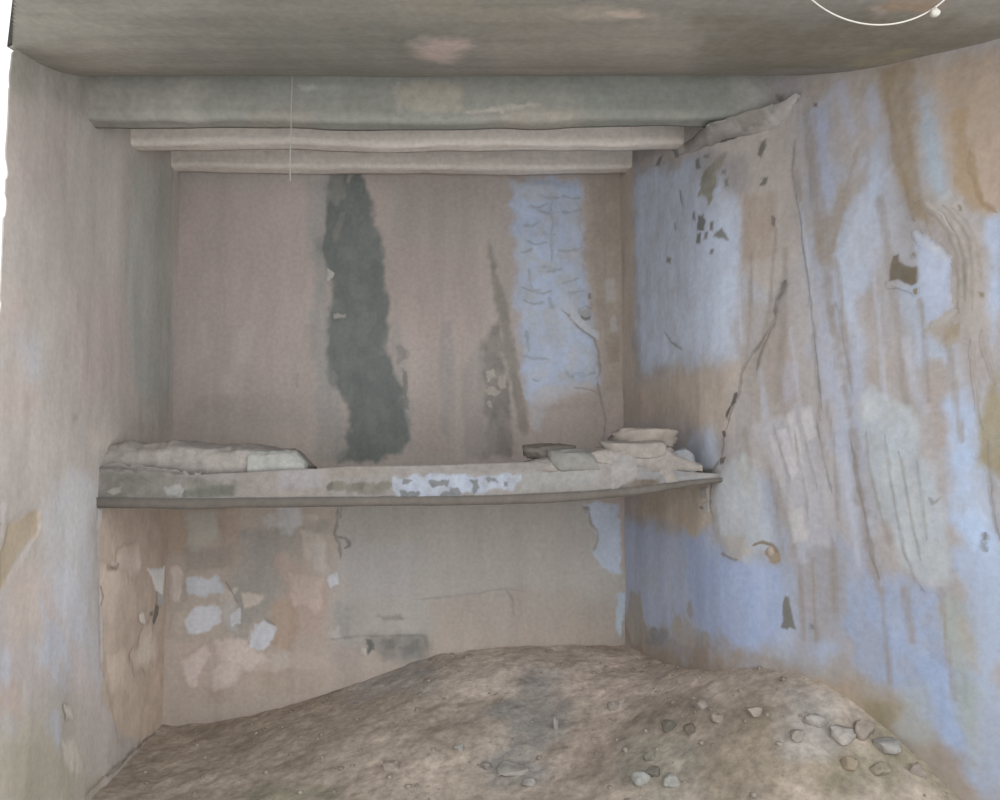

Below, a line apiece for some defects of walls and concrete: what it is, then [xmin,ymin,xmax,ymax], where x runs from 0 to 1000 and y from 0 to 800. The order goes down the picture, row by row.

peeling [679,149,731,256]
water stain [301,174,413,466]
peeling [505,174,602,437]
crack [699,140,822,521]
peeling [886,229,954,322]
flaking render [94,508,293,744]
peeling [260,507,340,616]
crack [332,507,352,561]
peeling [391,471,524,497]
peeling [581,499,624,576]
flaking render [780,593,815,631]